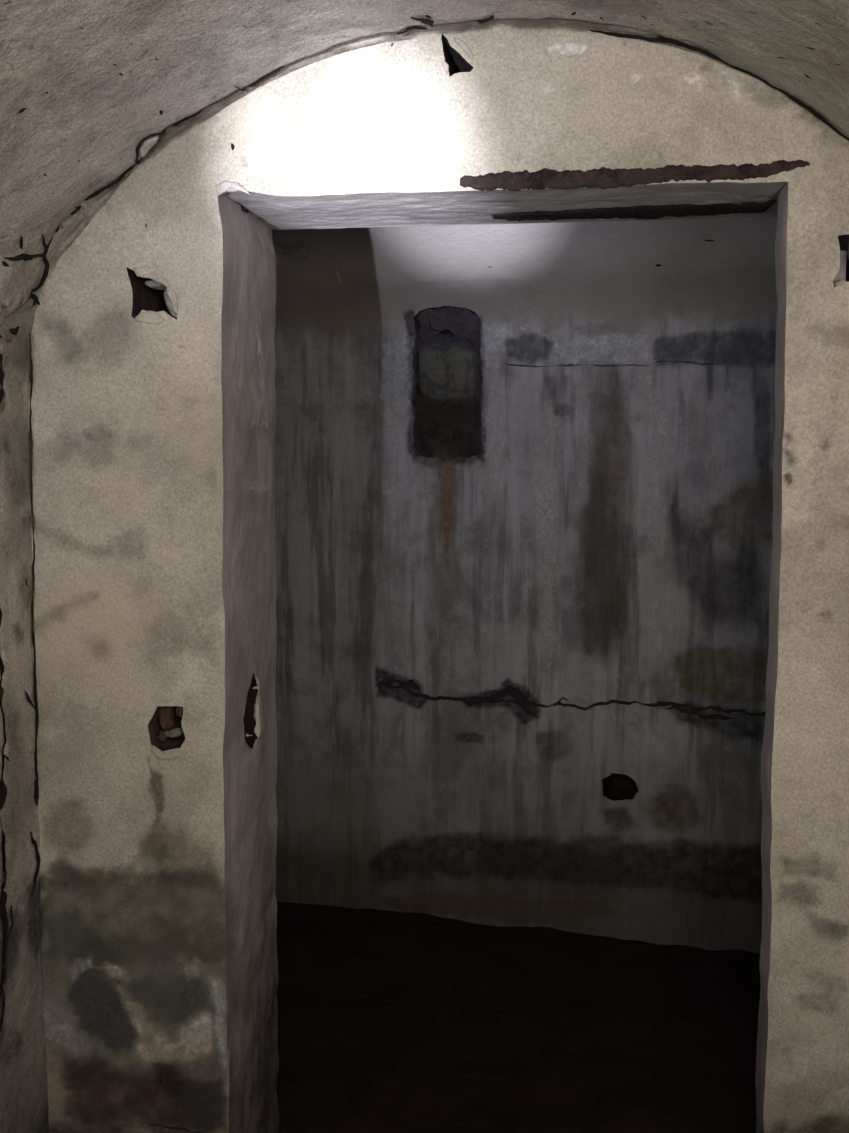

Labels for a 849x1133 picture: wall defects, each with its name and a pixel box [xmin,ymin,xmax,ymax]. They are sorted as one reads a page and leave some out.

hole [441,34,475,76]
crack [589,29,849,141]
rust [460,160,810,191]
flaking render [0,253,43,319]
hole [126,267,178,325]
leakage [487,323,776,381]
crack [0,66,284,1033]
leakage [463,679,539,723]
crack [378,679,766,720]
hole [148,706,185,761]
leakage [372,836,762,902]
leakage [2,868,235,1130]